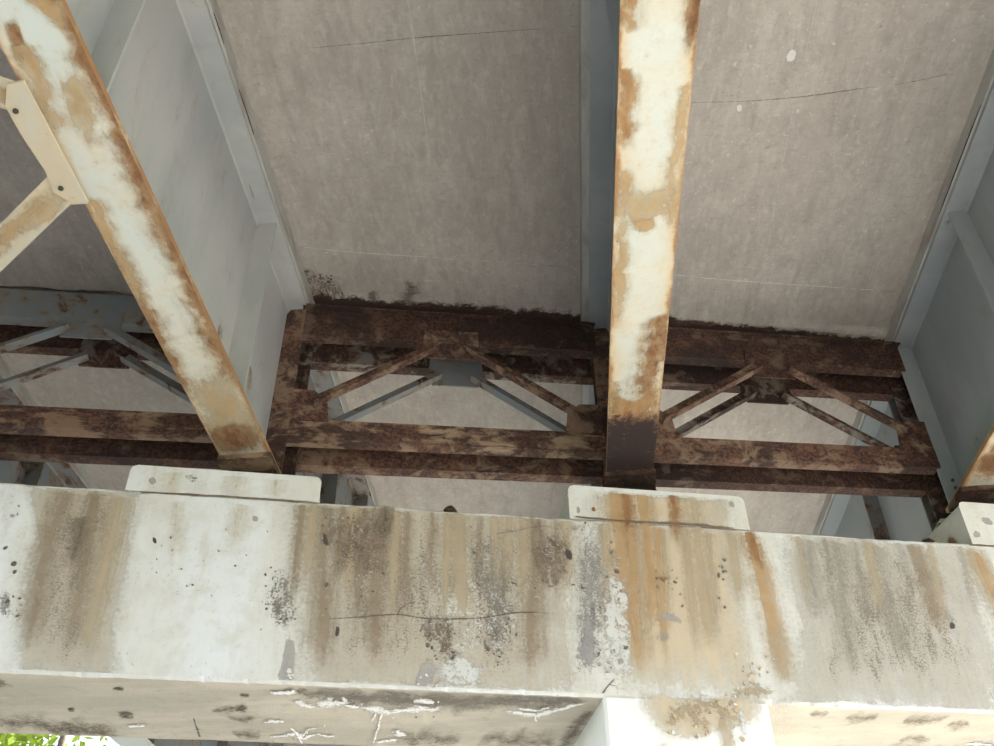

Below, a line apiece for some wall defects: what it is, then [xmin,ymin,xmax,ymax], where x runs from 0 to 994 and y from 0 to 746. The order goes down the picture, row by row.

corrosion [0,0,259,452]
crack [326,0,517,159]
corrosion [612,86,690,318]
corrosion [685,0,701,47]
crack [673,3,881,291]
corrosion [606,315,669,472]
damp [21,488,135,672]
damp [214,693,252,721]
damp [264,504,591,746]
crack [332,601,539,638]
corrosion [598,493,791,746]
damp [789,536,994,715]